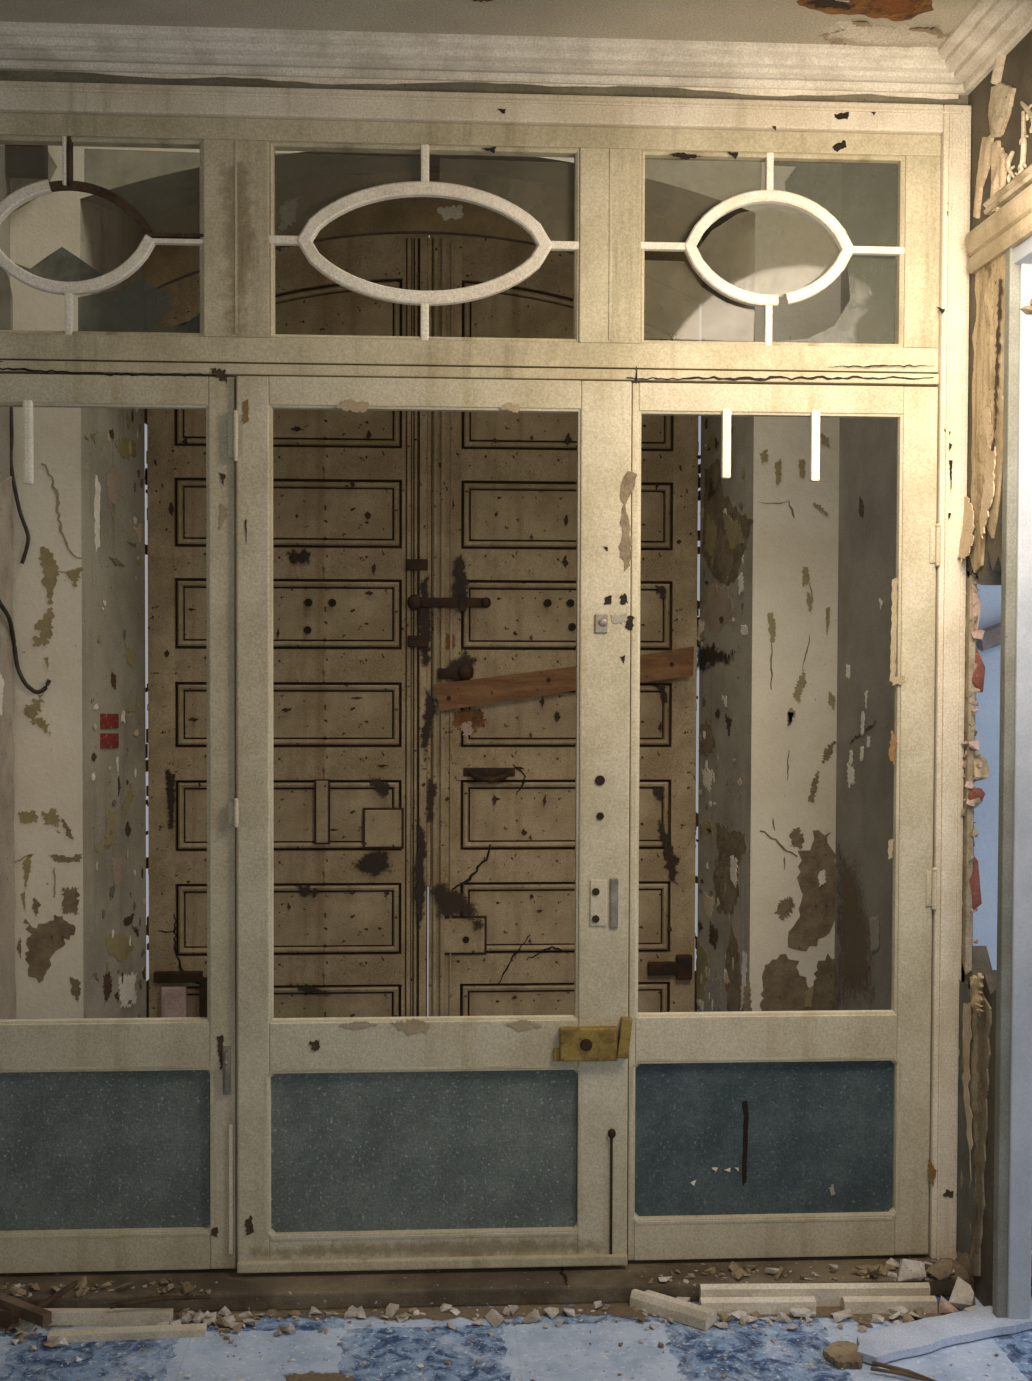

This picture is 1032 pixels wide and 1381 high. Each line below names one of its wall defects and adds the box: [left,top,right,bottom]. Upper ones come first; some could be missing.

rust [796,0,934,21]
peeling [0,476,146,1019]
peeling [85,409,143,580]
peeling [700,418,754,657]
flaking render [696,695,836,1012]
peeling [760,449,782,485]
peeling [767,612,776,643]
peeling [787,669,807,728]
peeling [802,567,830,635]
flaking render [928,253,1005,1285]